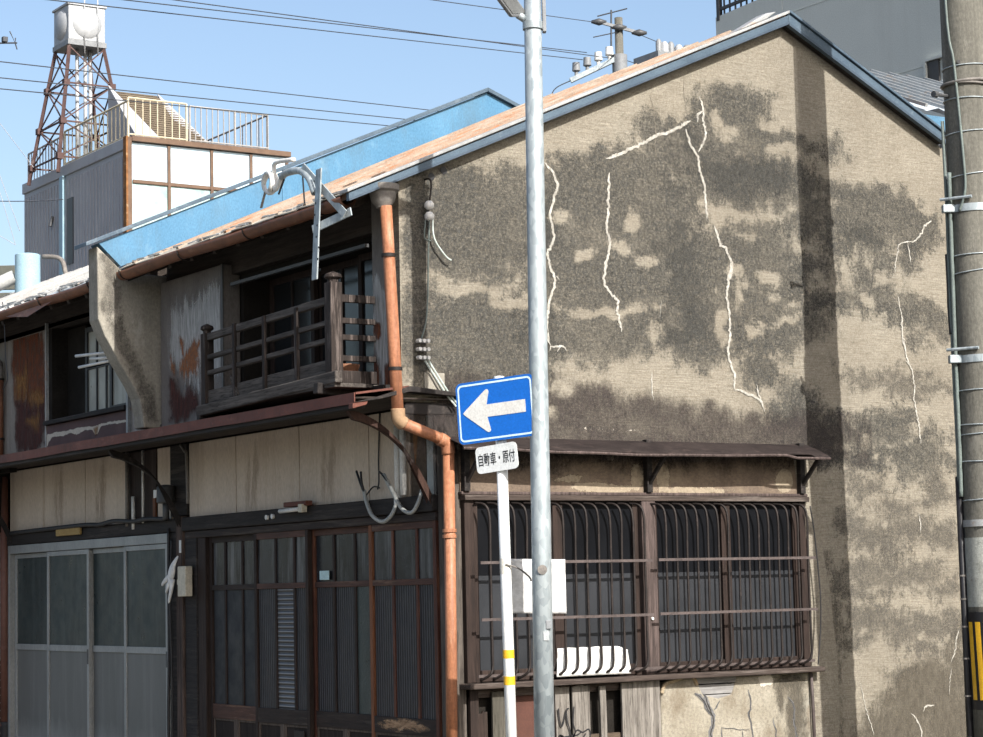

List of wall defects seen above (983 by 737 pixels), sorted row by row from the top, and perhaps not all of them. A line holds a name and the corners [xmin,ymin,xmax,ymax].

rust [11,332,45,452]
peeling [47,420,126,446]
rust [168,336,200,423]
peeling [168,282,221,394]
water stain [400,158,529,455]
water stain [510,451,530,470]
crack [545,163,567,352]
crack [603,76,765,412]
water stain [544,83,967,737]
crack [898,297,921,444]
crack [894,221,931,268]
crack [694,690,797,737]